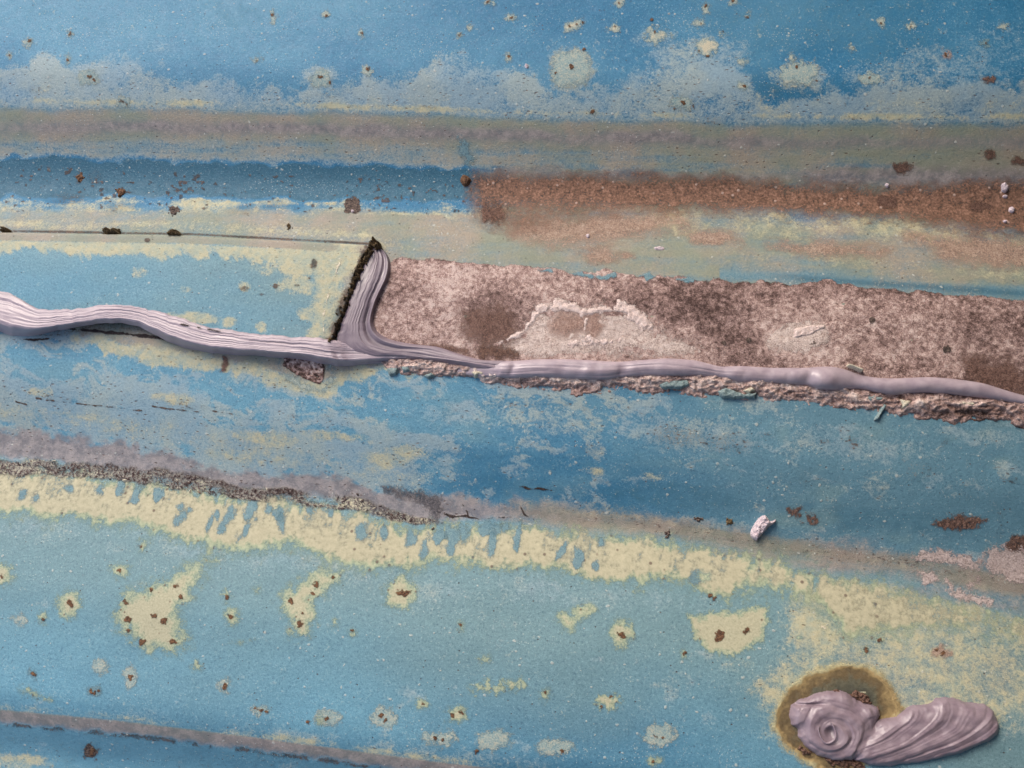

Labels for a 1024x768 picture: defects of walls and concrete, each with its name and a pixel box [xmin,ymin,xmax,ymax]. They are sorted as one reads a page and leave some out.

rust [473,162,1024,267]
spalling [373,257,1024,429]
peeling [0,458,444,530]
rust [932,514,988,532]
peeling [0,562,15,585]
peeling [109,557,220,655]
peeling [385,574,418,611]